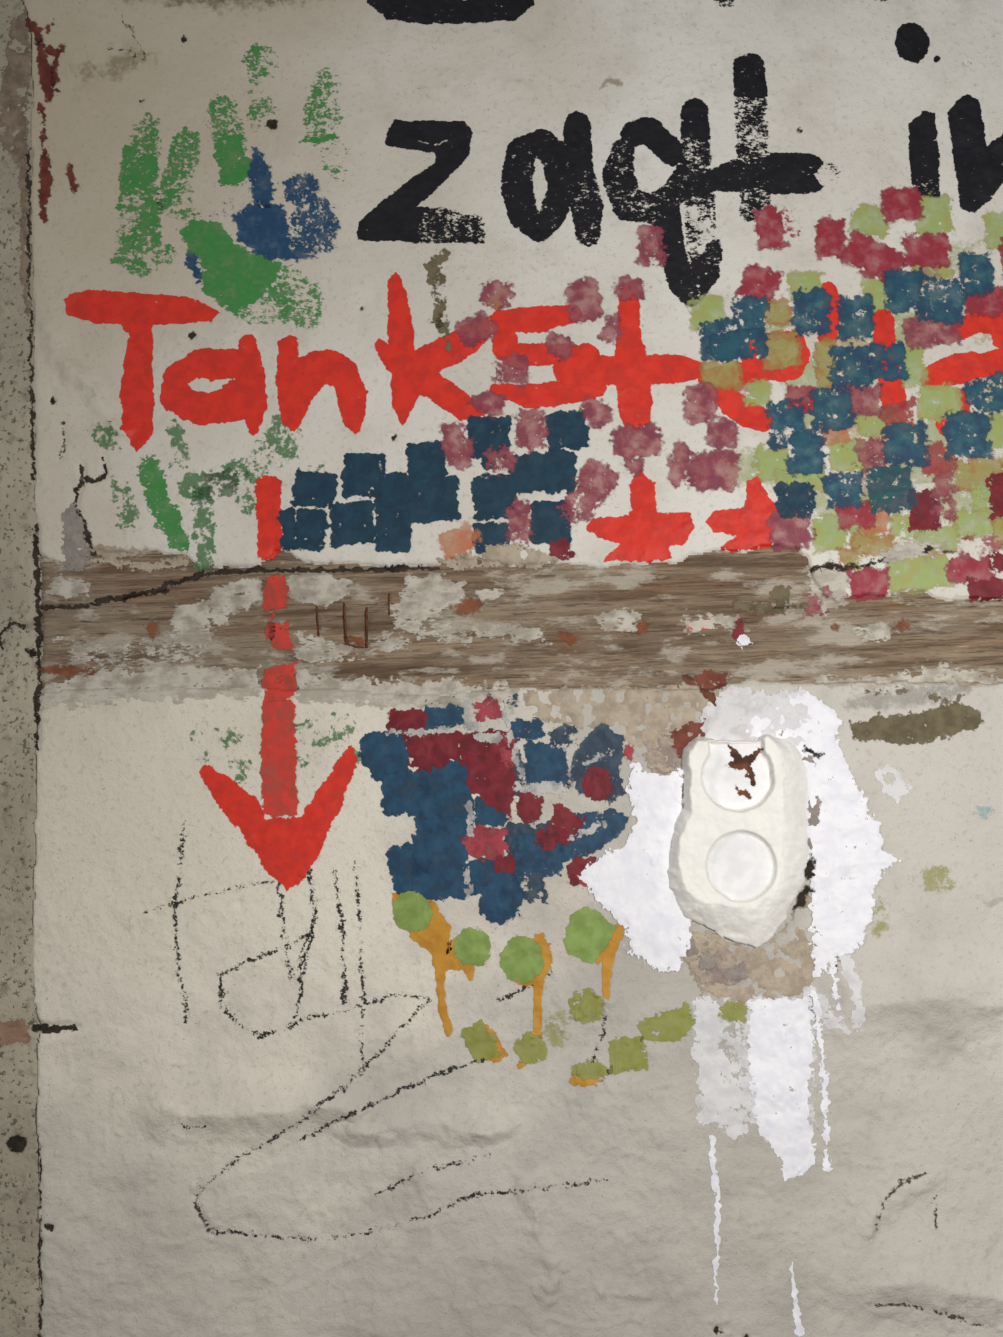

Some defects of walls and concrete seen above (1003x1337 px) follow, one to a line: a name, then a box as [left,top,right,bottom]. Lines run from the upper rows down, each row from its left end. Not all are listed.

spalling [45,502,189,601]
peeling [40,578,263,711]
spalling [286,542,731,775]
spalling [680,539,955,636]
peeling [852,621,892,645]
peeling [814,662,1003,690]
crack [36,1147,44,1337]